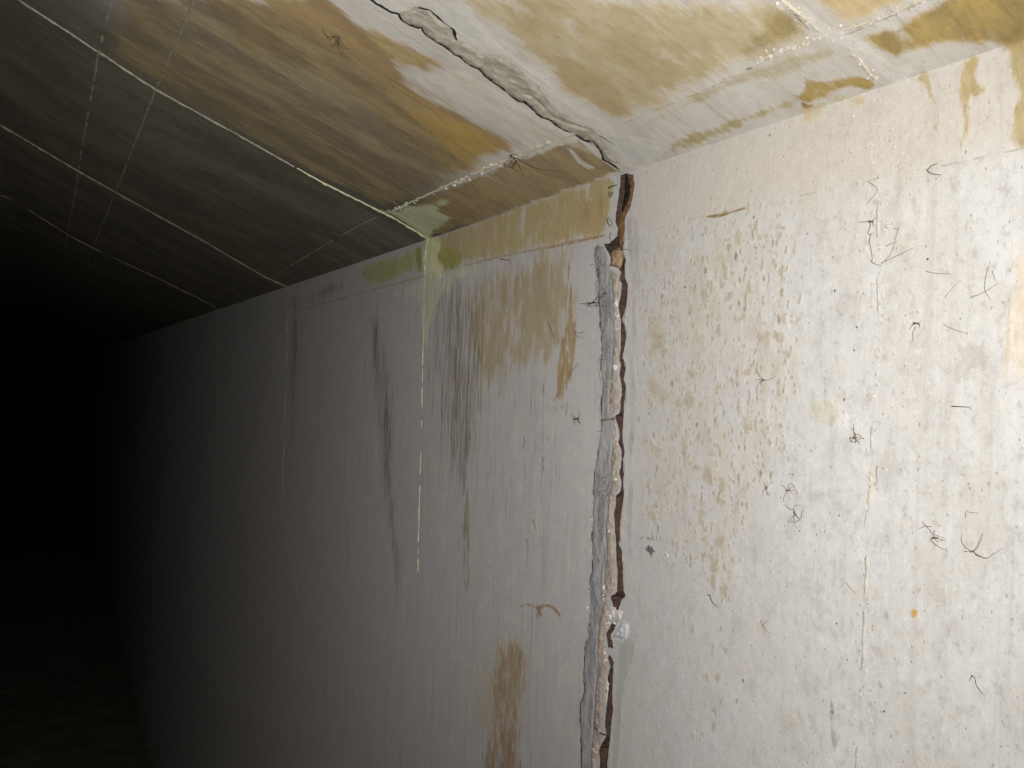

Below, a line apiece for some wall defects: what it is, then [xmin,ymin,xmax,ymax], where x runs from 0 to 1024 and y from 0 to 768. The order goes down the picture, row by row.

water stain [114,0,502,344]
crack [370,0,635,768]
water stain [469,249,567,387]
spalling [579,245,620,768]
water stain [434,0,1024,168]